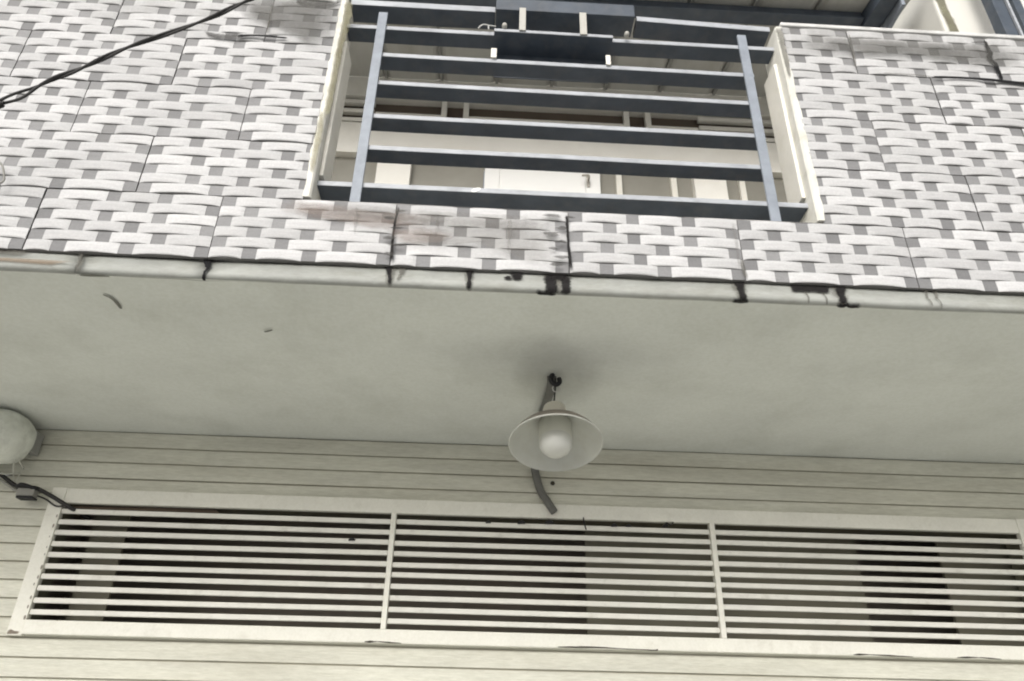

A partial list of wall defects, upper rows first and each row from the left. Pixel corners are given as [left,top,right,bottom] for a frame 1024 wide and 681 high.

crack [890,41,1024,85]
water stain [537,214,574,296]
water stain [733,282,748,303]
water stain [791,285,860,308]